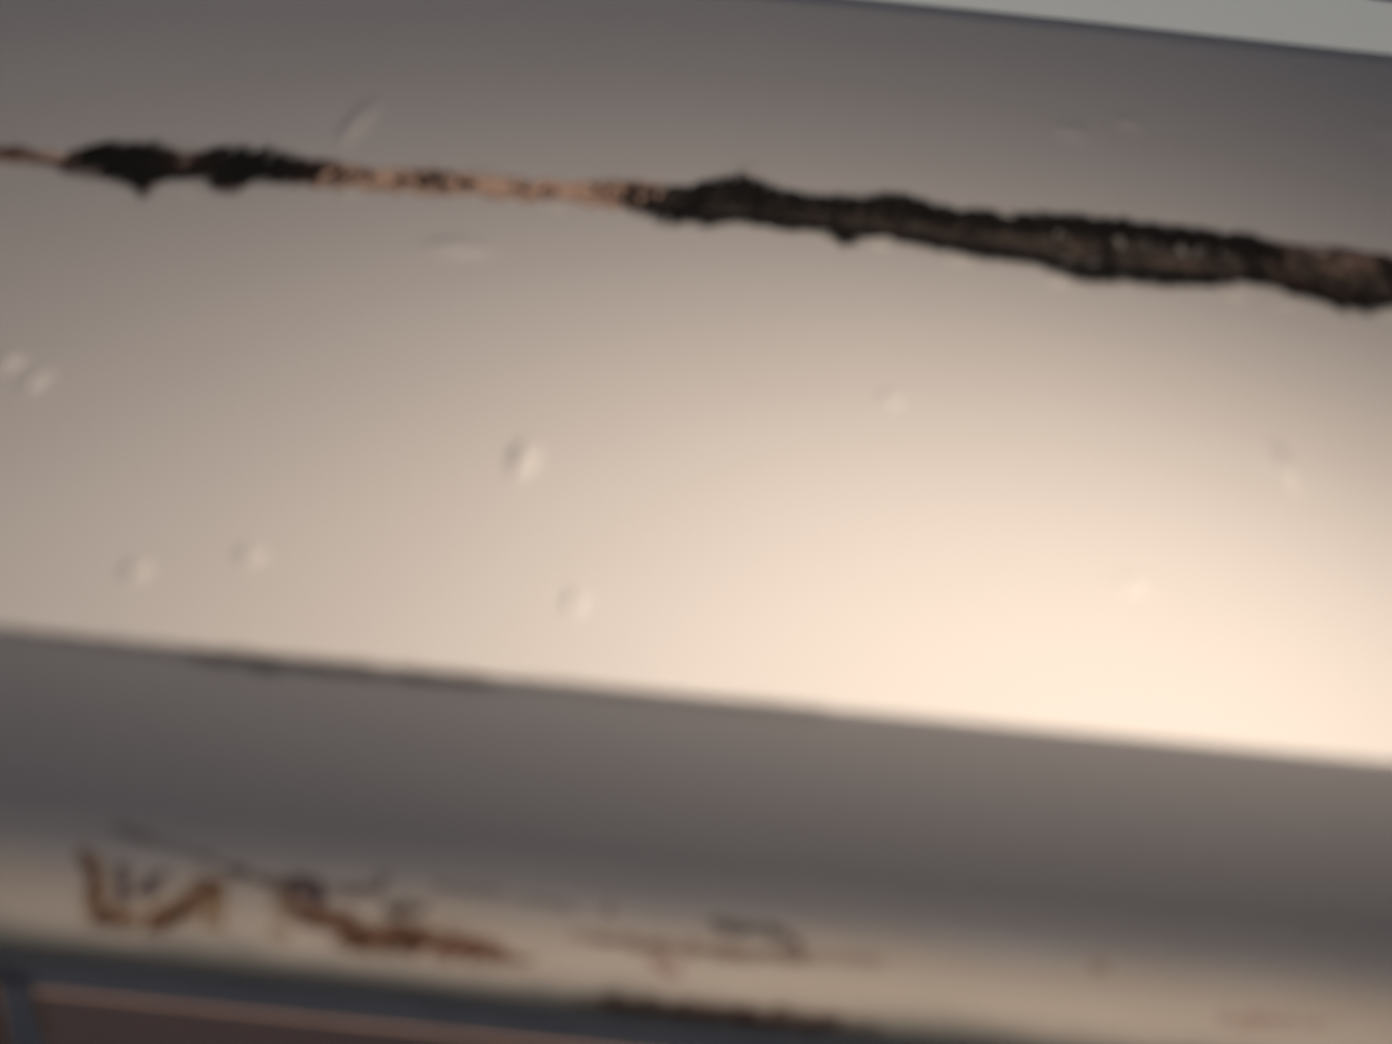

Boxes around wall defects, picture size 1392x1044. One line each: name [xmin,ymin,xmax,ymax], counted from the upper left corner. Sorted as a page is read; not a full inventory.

crack [0,139,1392,319]